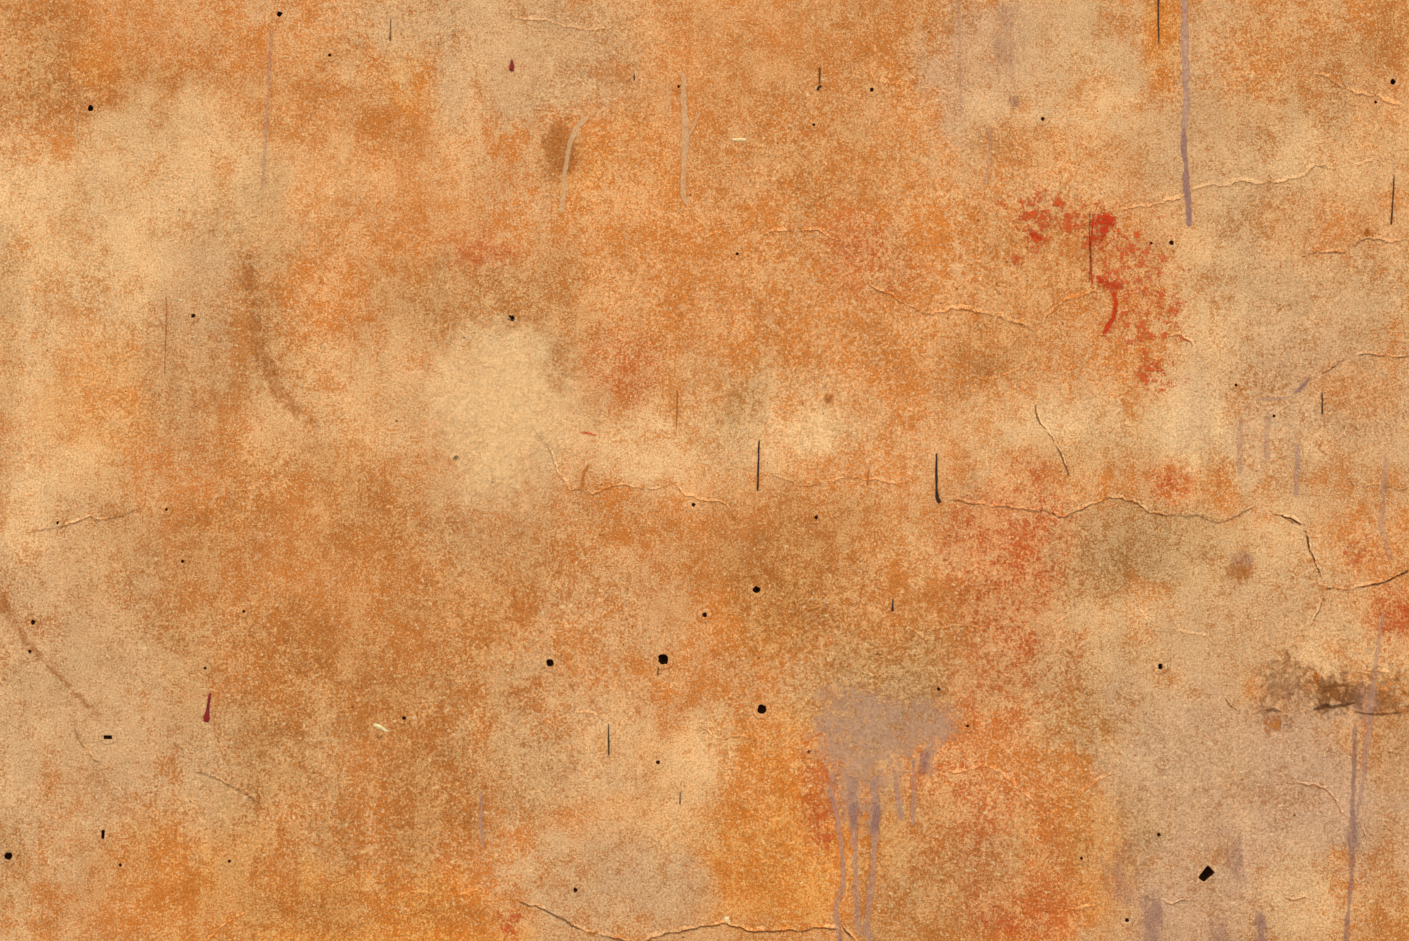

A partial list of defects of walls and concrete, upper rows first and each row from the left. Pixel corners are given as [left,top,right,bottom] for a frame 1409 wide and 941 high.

crack [868,279,1108,380]
corrosion [995,164,1197,395]
crack [532,426,742,522]
crack [953,405,1408,626]
crack [320,878,859,941]